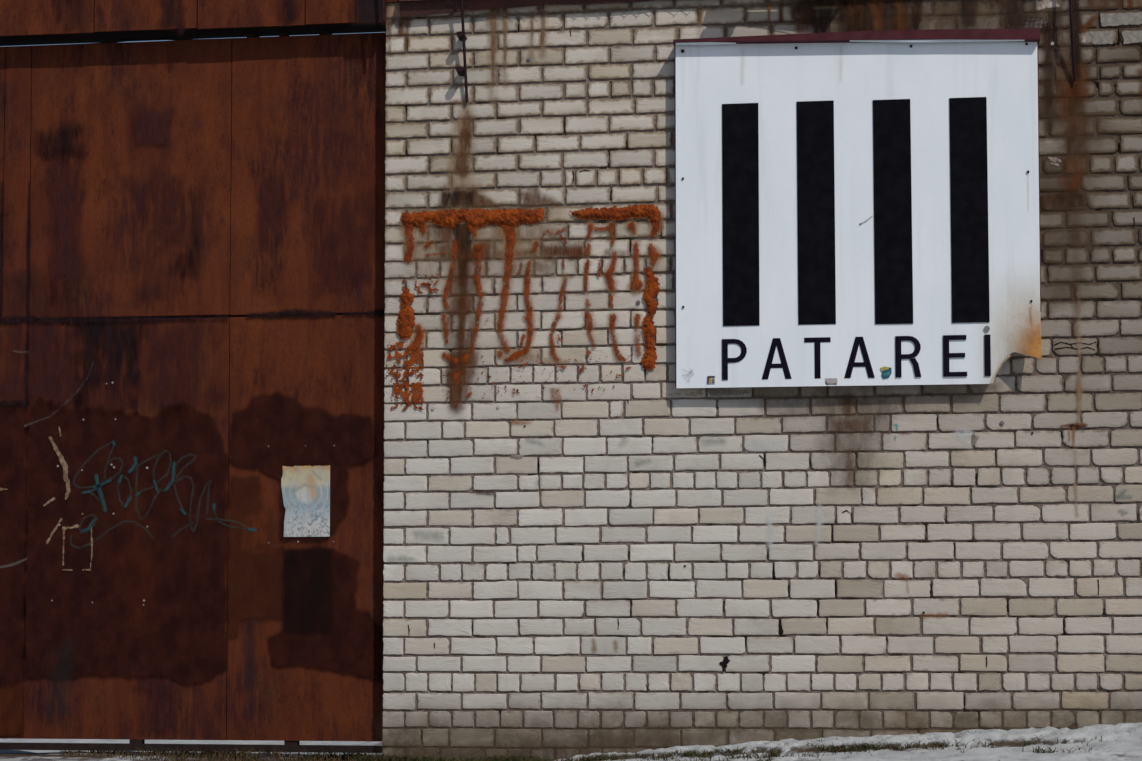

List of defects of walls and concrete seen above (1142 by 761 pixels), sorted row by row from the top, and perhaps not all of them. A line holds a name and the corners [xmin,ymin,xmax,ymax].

corrosion [768,0,1063,34]
corrosion [386,100,662,411]
corrosion [1061,423,1087,441]